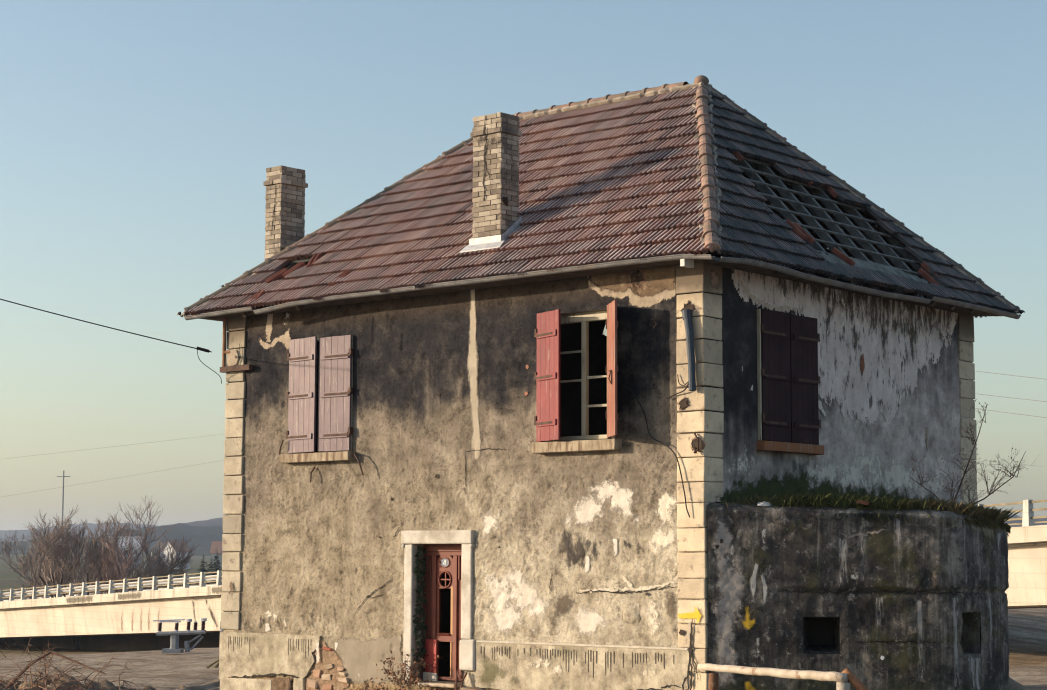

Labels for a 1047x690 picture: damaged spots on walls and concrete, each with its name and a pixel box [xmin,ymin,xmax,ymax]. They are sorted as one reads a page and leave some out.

flaking render [587,266,695,312]
flaking render [260,314,291,349]
flaking render [732,255,958,425]
damp [467,289,481,459]
damp [565,480,639,527]
crack [576,576,677,596]
damp [712,516,767,686]
damp [838,539,864,582]
spalling [271,677,292,690]
spalling [305,639,350,690]
damp [857,598,922,657]
damp [953,598,992,690]